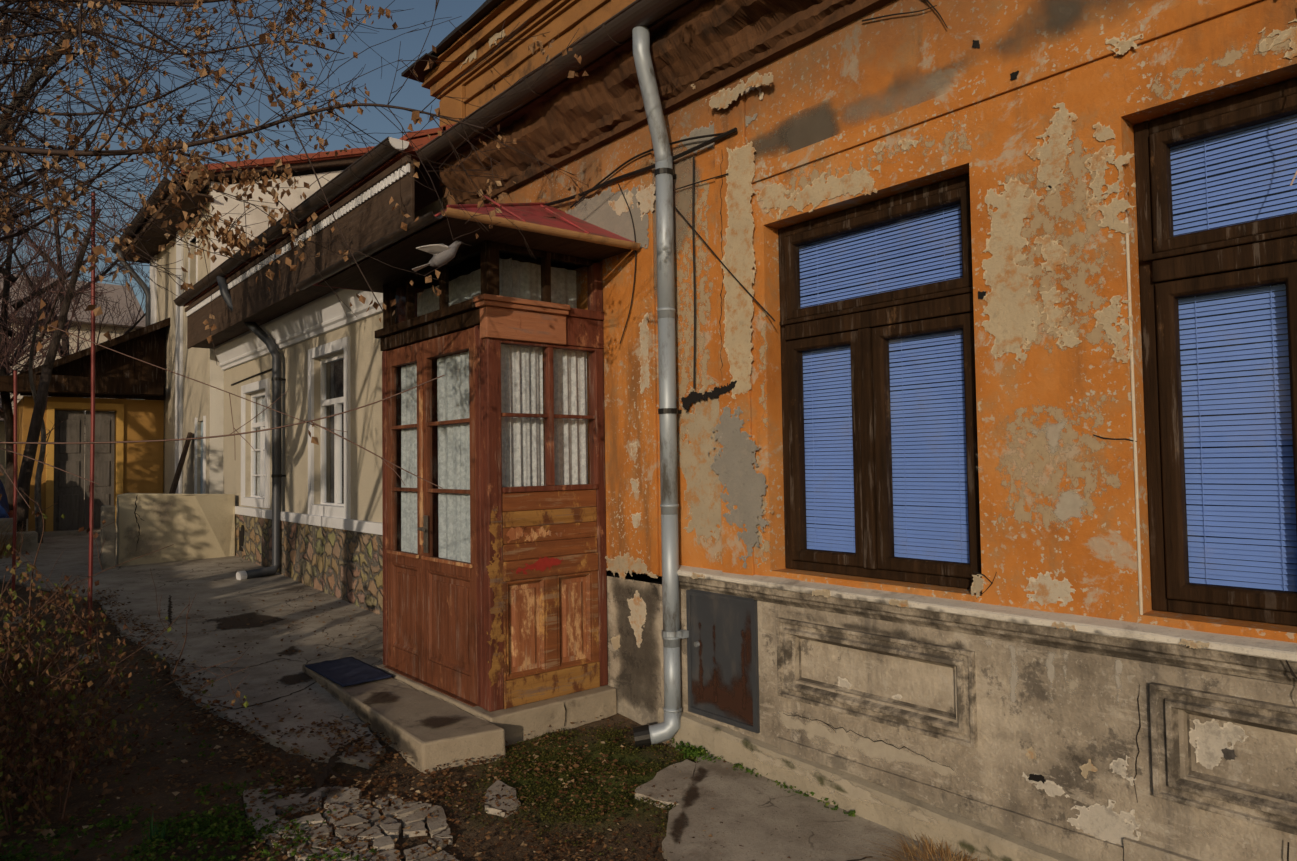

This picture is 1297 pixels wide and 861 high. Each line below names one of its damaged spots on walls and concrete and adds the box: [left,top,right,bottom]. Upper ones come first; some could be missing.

damp [752,78,943,155]
peeling [981,102,1136,364]
peeling [677,72,919,568]
peeling [486,506,566,687]
peeling [1024,571,1076,606]
corrosion [692,620,753,726]
crack [1285,660,1297,679]
peeling [1189,719,1249,770]
peeling [1022,746,1141,847]